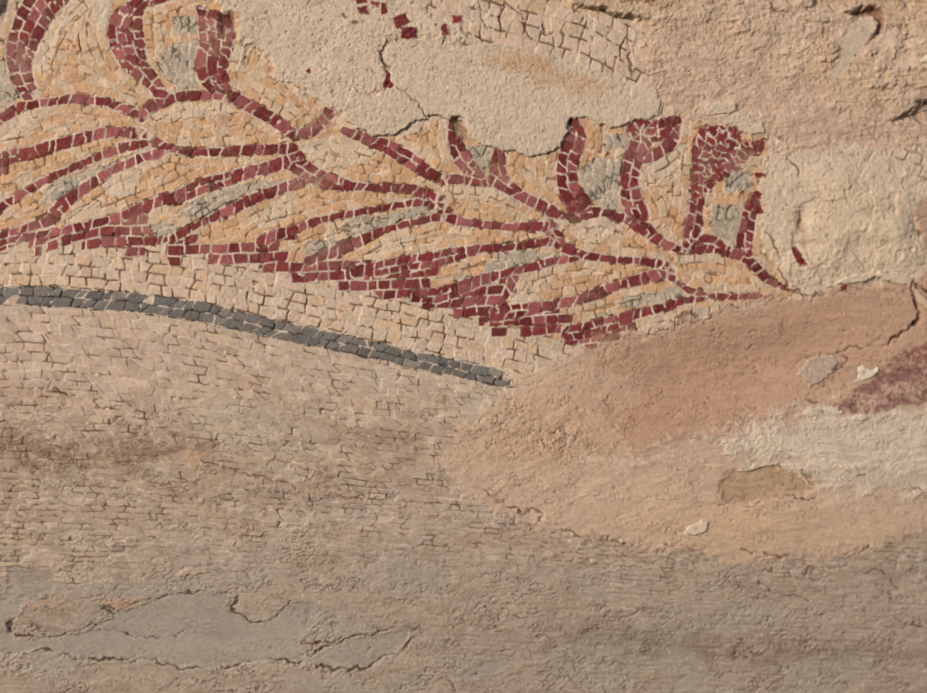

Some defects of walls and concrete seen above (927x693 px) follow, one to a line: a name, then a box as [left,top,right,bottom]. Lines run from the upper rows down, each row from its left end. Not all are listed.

spalling [449,117,473,145]
spalling [567,118,580,133]
flaking render [705,101,765,137]
crack [790,281,927,405]
spalling [797,354,838,388]
flaking render [855,365,879,381]
spalling [717,462,819,511]
crack [0,589,425,674]